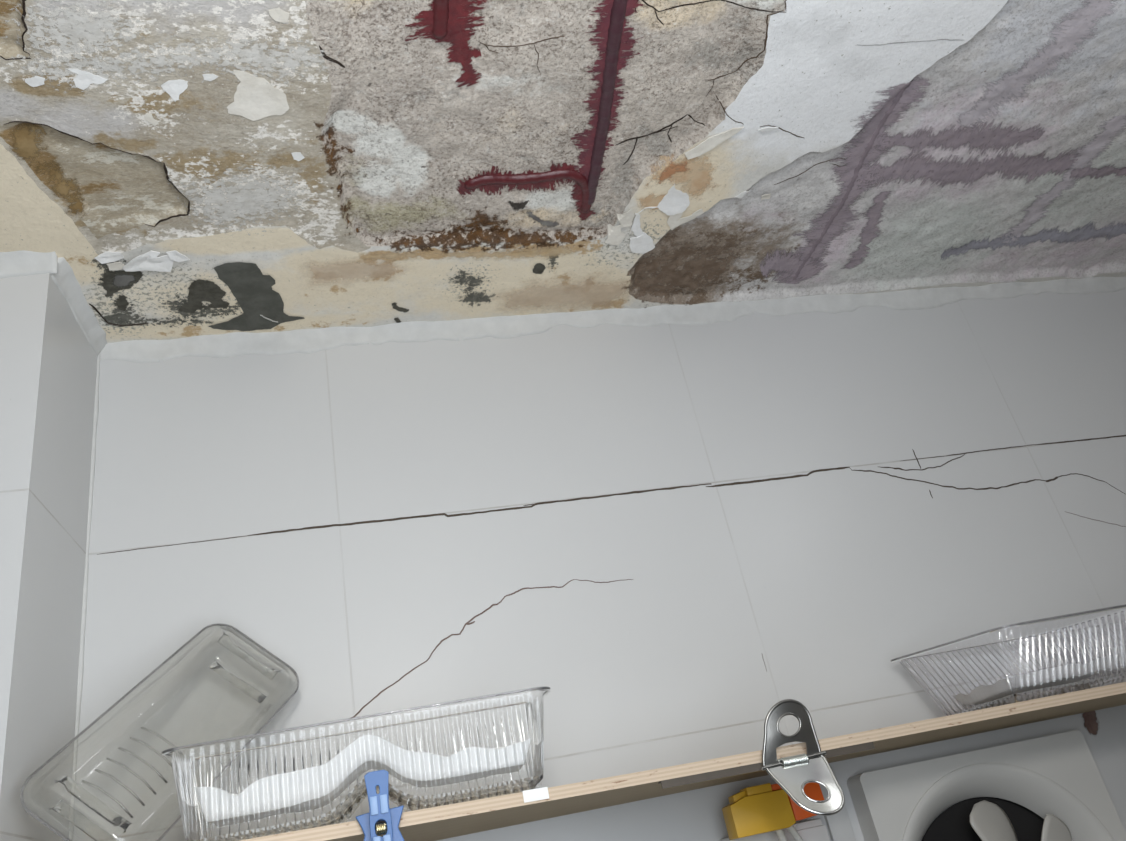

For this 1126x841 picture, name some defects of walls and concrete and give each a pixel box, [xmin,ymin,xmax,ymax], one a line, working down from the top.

crack [615,0,804,165]
spalling [0,0,1126,304]
crack [774,158,845,185]
mould [87,254,244,330]
spalling [209,262,304,331]
damp [449,270,496,306]
damp [532,255,559,274]
crack [97,435,1126,555]
crack [334,579,633,724]